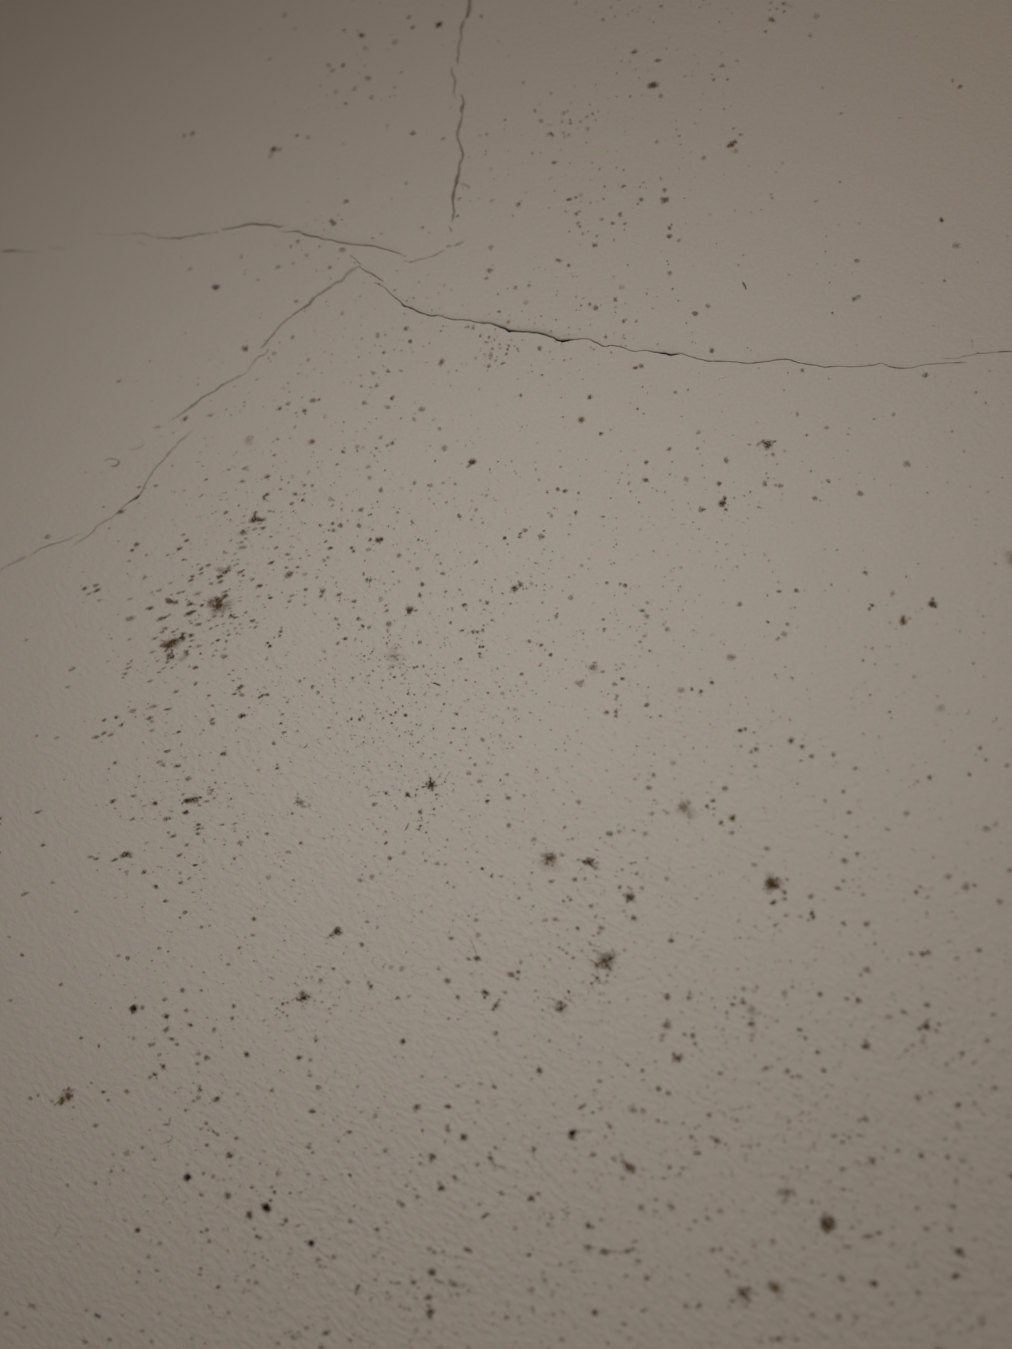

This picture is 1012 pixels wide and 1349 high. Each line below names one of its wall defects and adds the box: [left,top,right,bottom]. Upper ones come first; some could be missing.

crack [350,247,1012,369]
water stain [94,442,545,971]
water stain [268,928,384,1033]
water stain [482,774,771,1094]
water stain [166,1143,326,1266]
water stain [713,1028,924,1317]